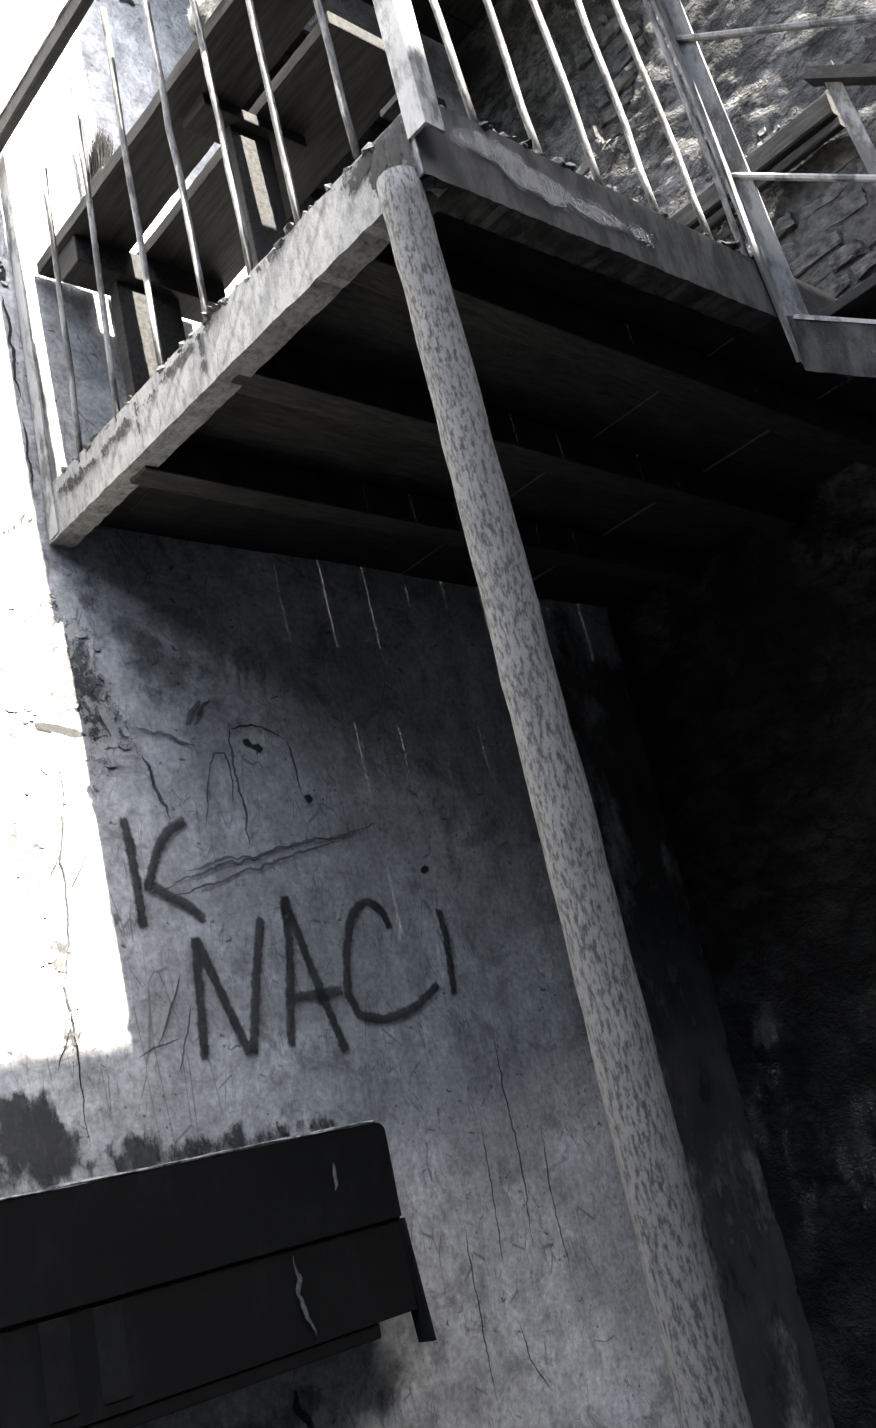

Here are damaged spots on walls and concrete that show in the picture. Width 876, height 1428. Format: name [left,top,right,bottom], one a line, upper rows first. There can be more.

crack [0,297,34,535]
peeling [0,578,135,791]
crack [48,749,93,1146]
leakage [0,1090,335,1192]